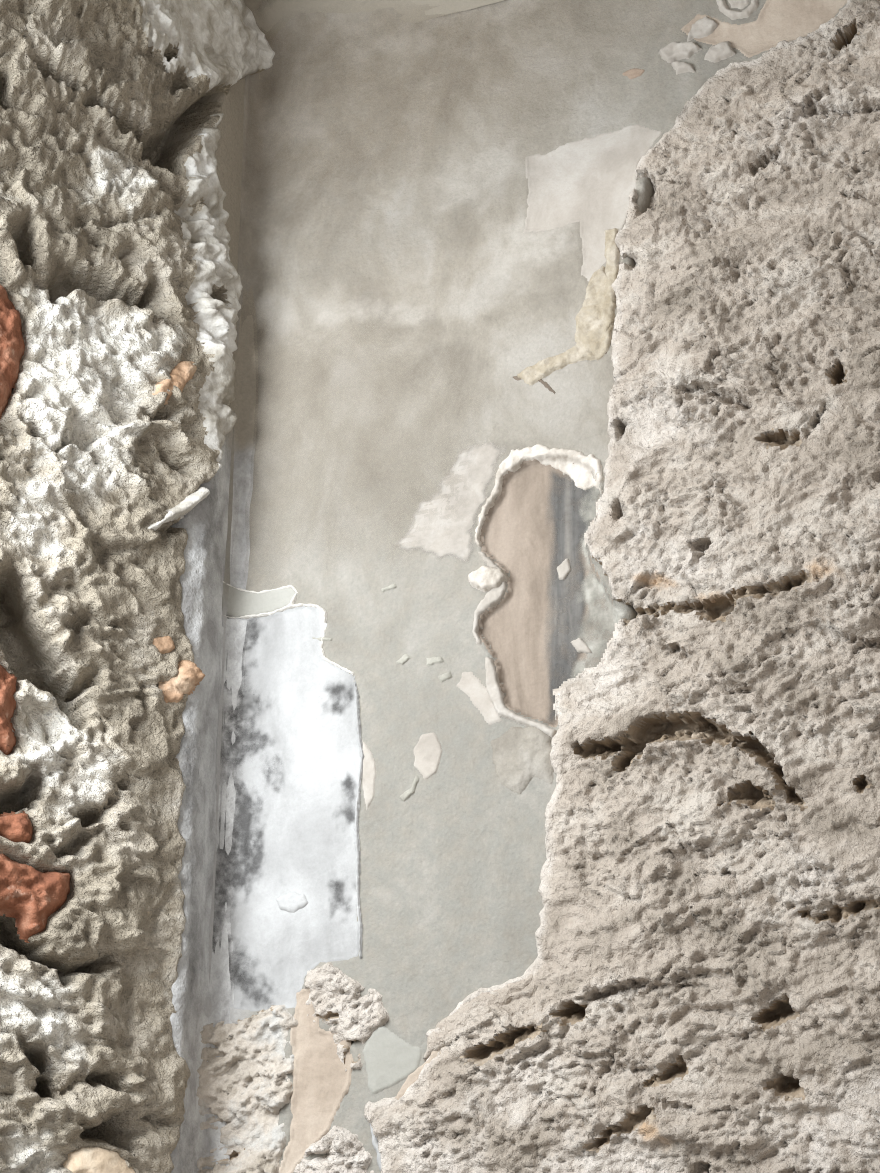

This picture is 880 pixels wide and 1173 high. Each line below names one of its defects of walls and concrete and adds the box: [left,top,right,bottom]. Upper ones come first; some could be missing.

flaking render [0,0,275,1173]
flaking render [196,0,880,1173]
leakage [243,622,258,651]
leakage [220,661,266,764]
leakage [331,685,352,712]
leakage [343,778,354,822]
leakage [213,777,262,952]
leakage [334,882,343,902]
leakage [229,953,268,1002]